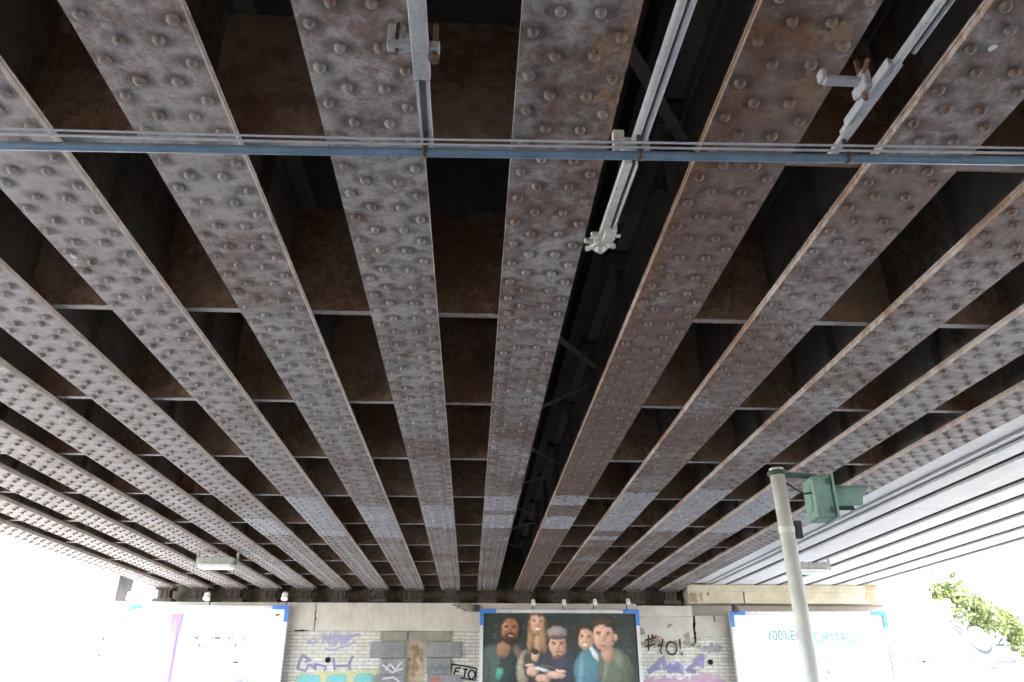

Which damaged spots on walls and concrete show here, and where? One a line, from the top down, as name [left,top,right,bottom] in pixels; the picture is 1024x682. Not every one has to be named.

crack [690,616,717,646]